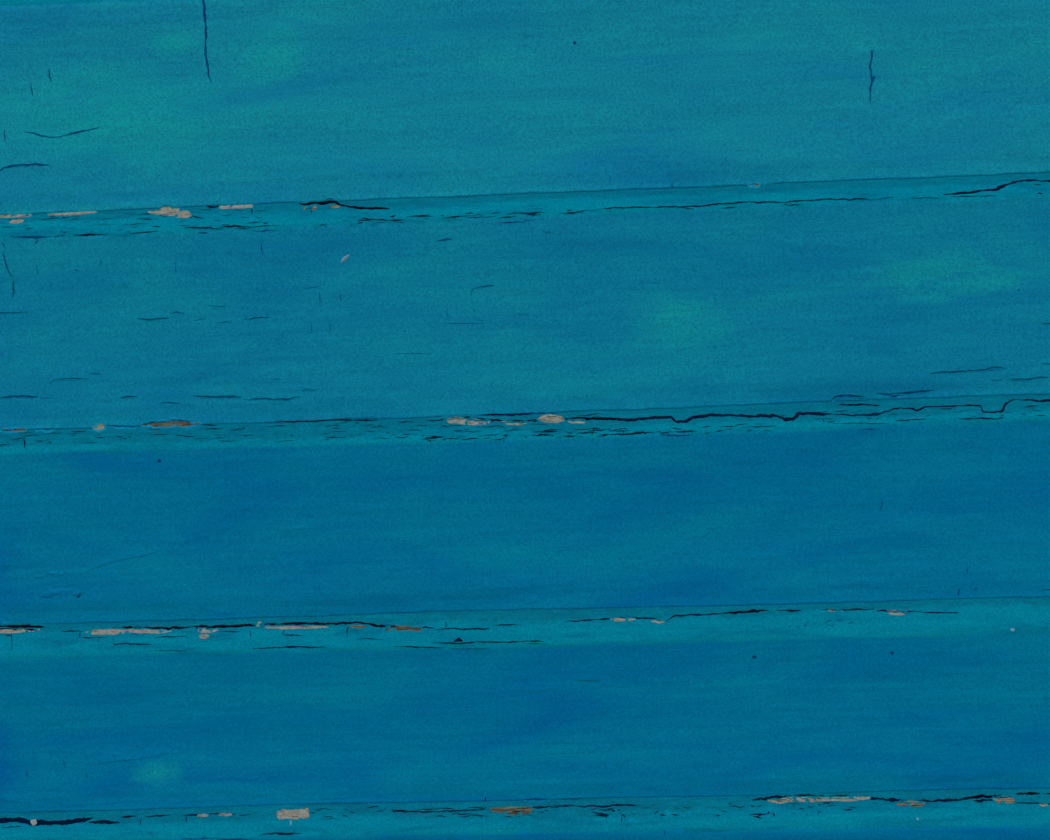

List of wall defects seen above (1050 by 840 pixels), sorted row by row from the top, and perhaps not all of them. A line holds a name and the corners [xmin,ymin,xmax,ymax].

crack [201,0,212,83]
crack [923,177,1050,198]
peeling [0,213,33,226]
peeling [46,210,123,218]
peeling [138,204,254,220]
crack [347,197,892,242]
crack [0,363,1050,449]
peeling [430,412,621,427]
peeling [0,623,45,640]
peeling [63,620,491,640]
peeling [767,794,871,811]
peeling [275,806,311,823]